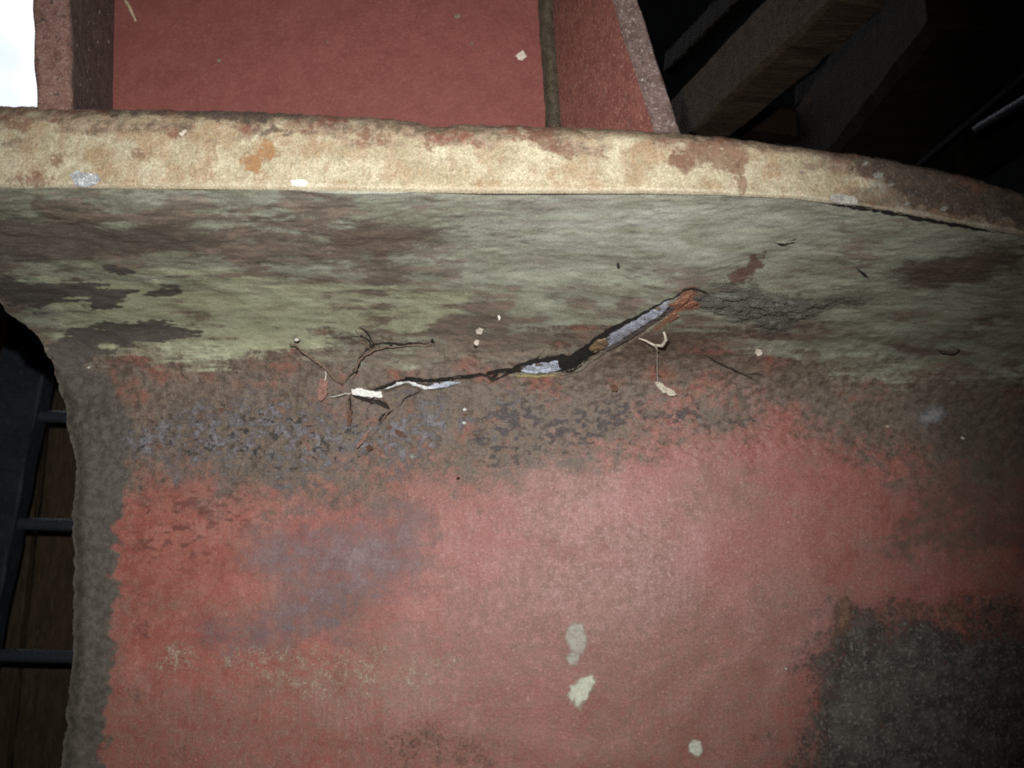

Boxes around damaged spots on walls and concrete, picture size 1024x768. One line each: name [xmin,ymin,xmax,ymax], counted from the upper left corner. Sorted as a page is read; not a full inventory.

damp [0,209,224,378]
damp [310,220,442,257]
crack [325,288,709,426]
rust [728,252,766,284]